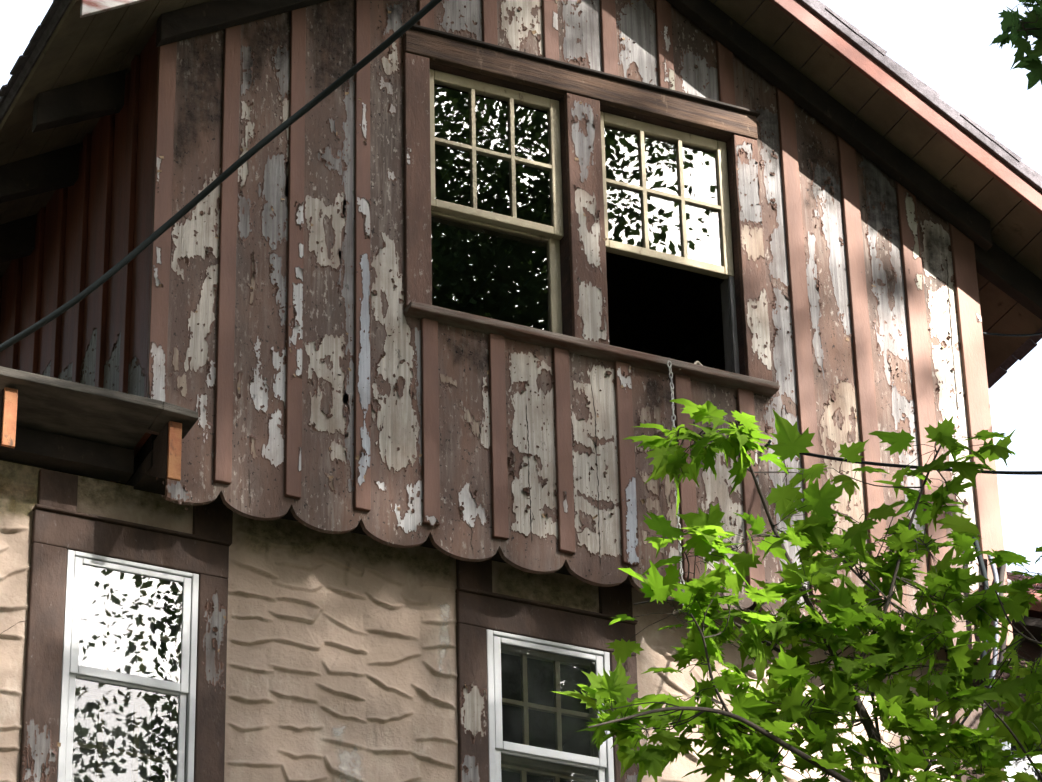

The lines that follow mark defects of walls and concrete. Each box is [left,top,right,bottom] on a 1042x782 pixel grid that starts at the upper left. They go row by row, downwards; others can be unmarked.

peeling [499,0,602,72]
peeling [616,0,719,101]
peeling [36,168,221,445]
peeling [236,45,440,534]
peeling [568,94,610,344]
peeling [507,350,682,565]
peeling [697,442,748,579]
peeling [735,107,805,581]
peeling [804,158,869,573]
peeling [857,152,983,591]
peeling [22,718,61,782]
peeling [460,679,488,782]